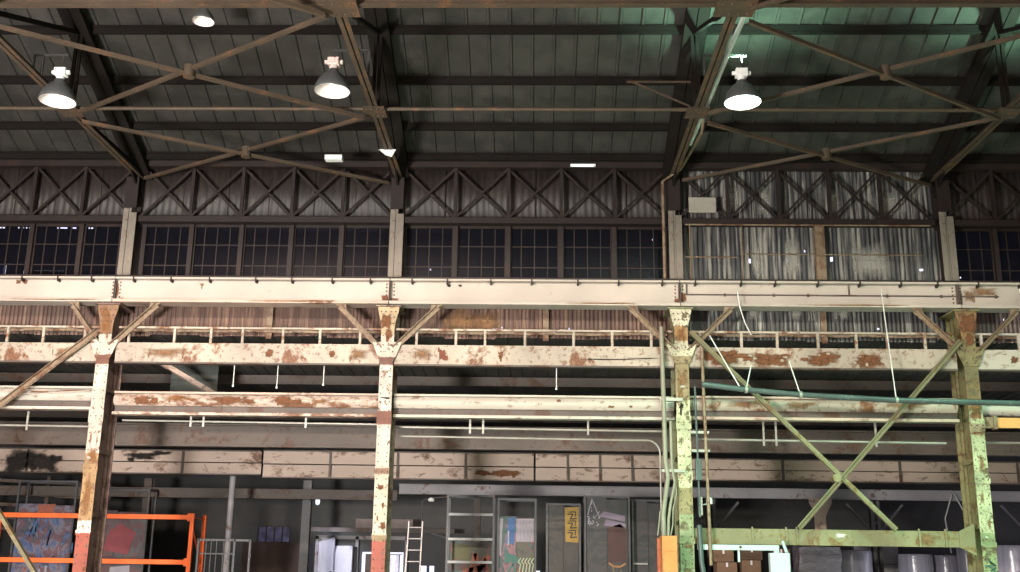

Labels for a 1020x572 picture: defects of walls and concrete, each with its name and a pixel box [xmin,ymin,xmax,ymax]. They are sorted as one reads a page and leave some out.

rust [415,347,448,361]
rust [132,395,196,404]
rust [211,397,255,405]
rust [271,396,335,406]